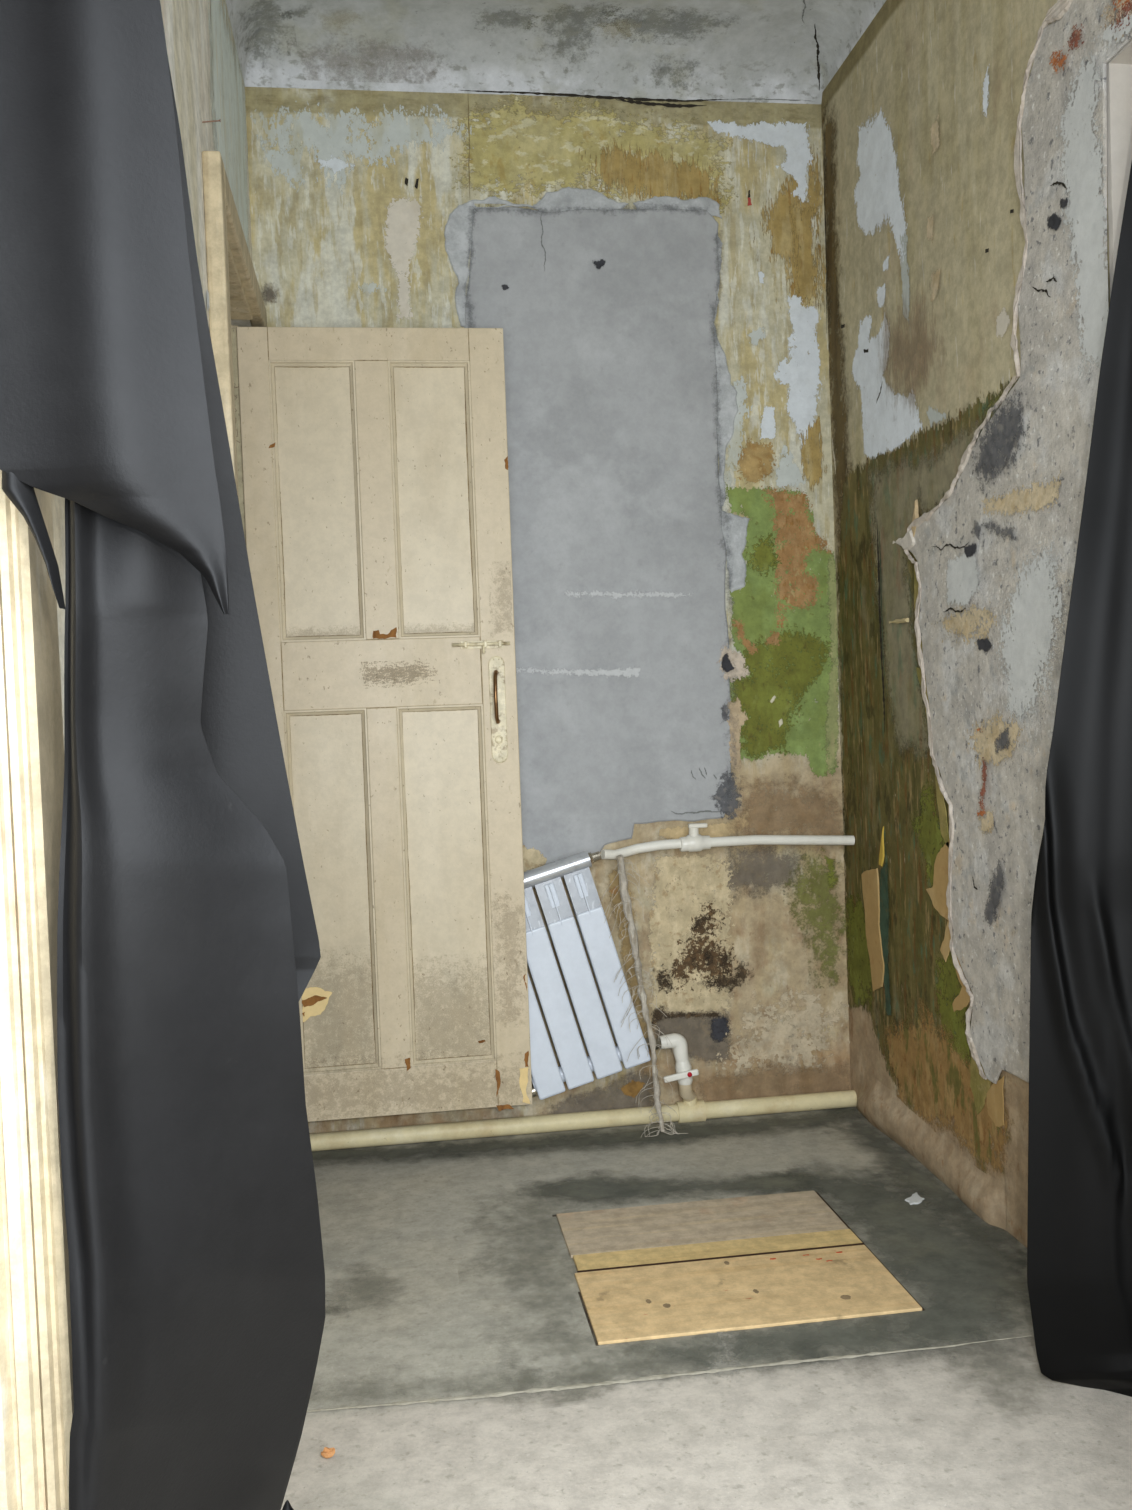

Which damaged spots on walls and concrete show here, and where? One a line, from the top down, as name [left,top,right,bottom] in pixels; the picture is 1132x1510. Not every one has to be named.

peeling [357,196,424,320]
crack [461,0,827,331]
peeling [708,119,813,203]
peeling [852,108,946,459]
peeling [373,627,397,639]
peeling [718,295,839,778]
spalling [889,0,1132,1127]
leakage [312,377,1030,1376]